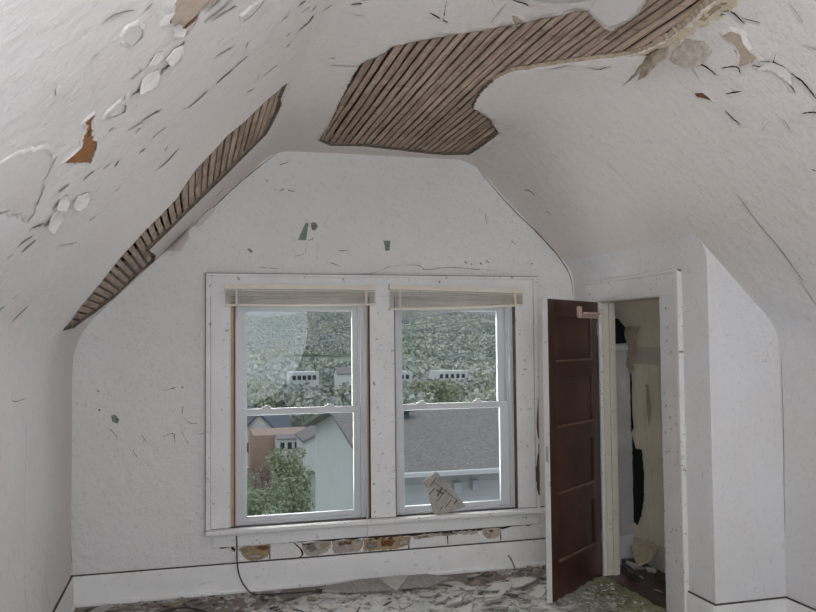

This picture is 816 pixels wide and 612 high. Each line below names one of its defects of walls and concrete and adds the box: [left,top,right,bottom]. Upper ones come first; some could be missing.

peeling [140,0,216,97]
crack [188,41,250,109]
crack [282,0,373,47]
flaking render [319,0,738,155]
crack [0,159,122,277]
peeling [0,99,129,223]
crack [109,109,178,169]
flaking render [63,84,287,330]
crack [188,156,294,227]
crack [737,195,816,305]
spalling [238,544,271,561]
spalling [301,527,501,556]